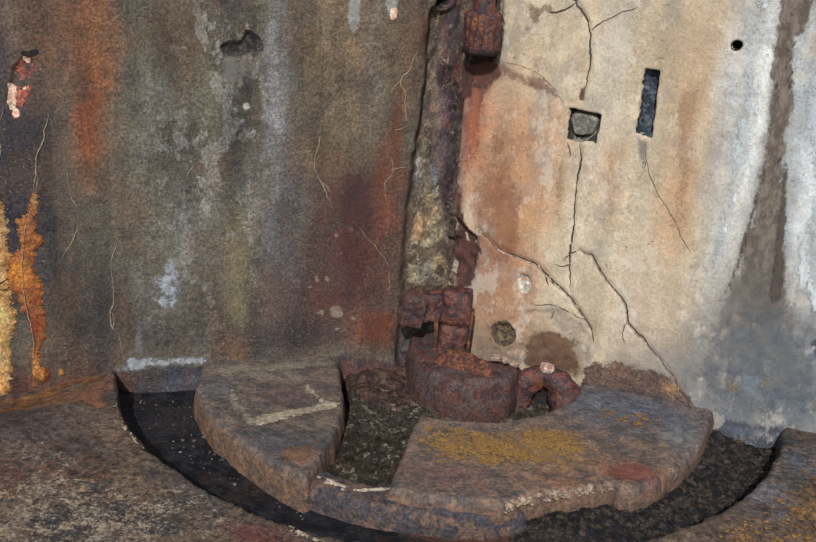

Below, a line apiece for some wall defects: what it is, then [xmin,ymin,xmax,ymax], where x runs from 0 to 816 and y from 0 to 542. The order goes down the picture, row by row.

spalling [6,49,39,120]
spalling [220,29,264,56]
crack [500,0,638,104]
water stain [728,0,814,303]
crack [453,143,689,401]
water stain [797,207,816,312]
corrosion [466,308,475,350]
water stain [703,313,816,409]